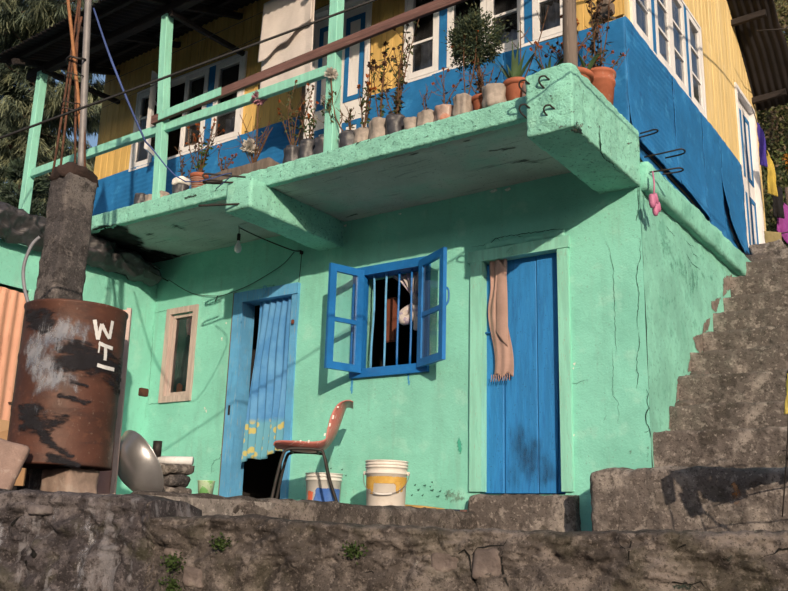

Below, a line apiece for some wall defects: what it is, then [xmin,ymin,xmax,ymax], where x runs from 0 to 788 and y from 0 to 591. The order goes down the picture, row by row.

crack [636,241,651,435]
peeling [693,274,732,353]